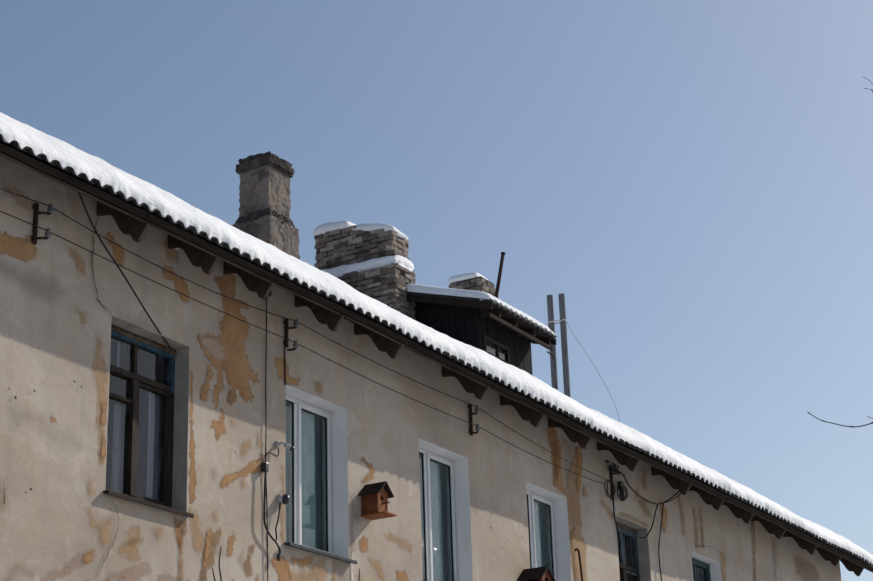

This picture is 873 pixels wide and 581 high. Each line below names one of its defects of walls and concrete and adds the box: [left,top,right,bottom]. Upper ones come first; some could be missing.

peeling [0,231,37,262]
crack [91,215,113,317]
peeling [163,242,190,302]
peeling [93,339,108,463]
peeling [189,274,264,551]
peeling [275,357,300,386]
peeling [547,428,587,581]
peeling [271,556,325,581]